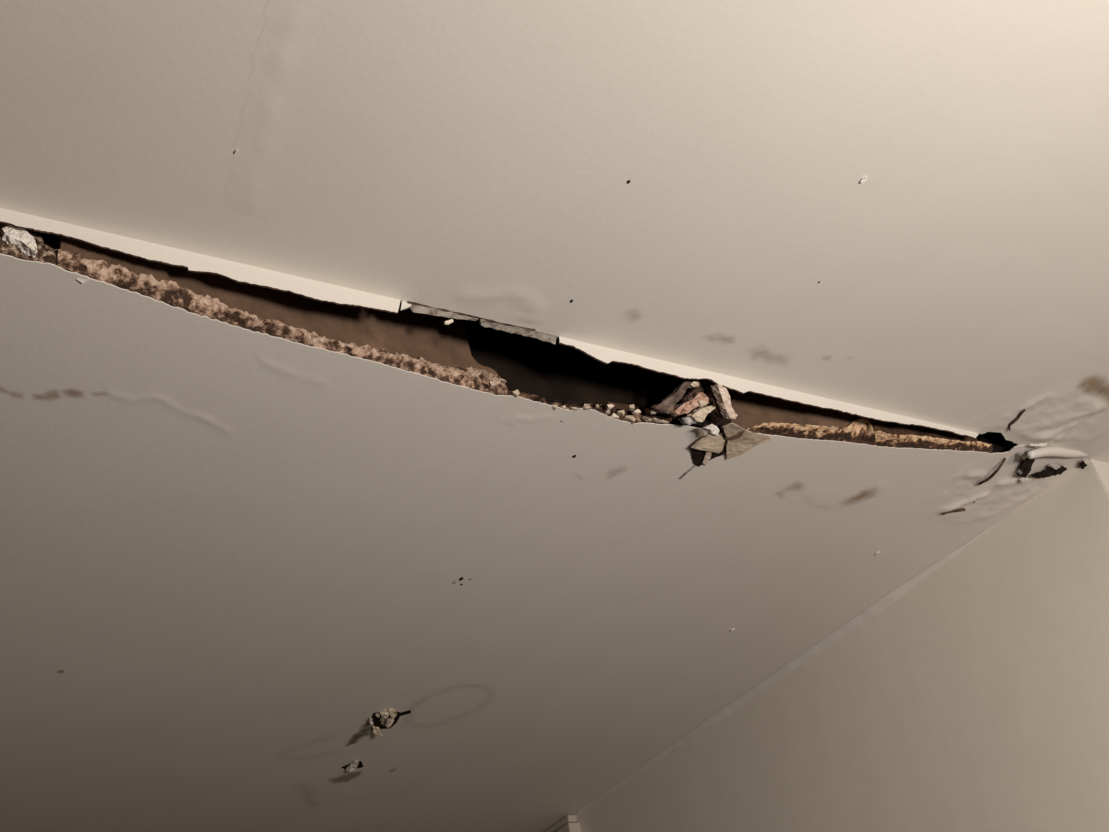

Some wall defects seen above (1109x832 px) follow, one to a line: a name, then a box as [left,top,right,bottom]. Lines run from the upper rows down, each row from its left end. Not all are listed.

spalling [0,223,687,425]
peeling [720,375,1109,530]
spalling [341,760,363,772]
spalling [348,709,411,745]